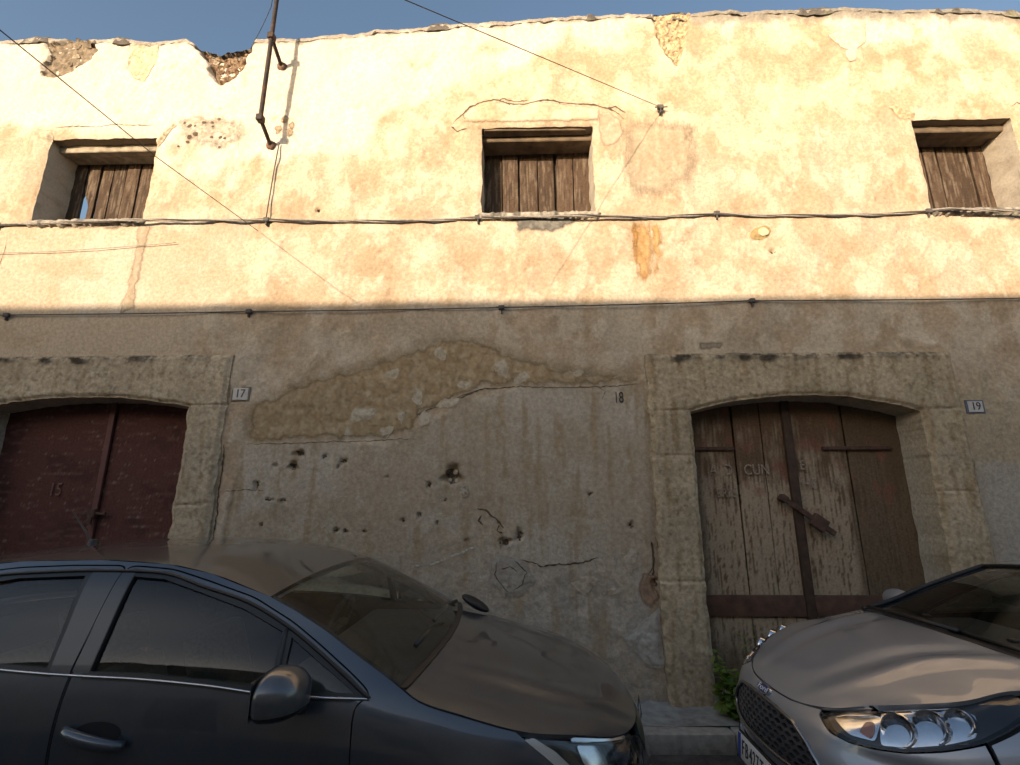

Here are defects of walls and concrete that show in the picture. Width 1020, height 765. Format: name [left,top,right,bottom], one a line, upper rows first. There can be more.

spalling [653,13,690,66]
spalling [40,40,98,78]
spalling [201,45,253,86]
crack [451,98,624,132]
crack [478,508,504,533]
crack [523,558,596,567]